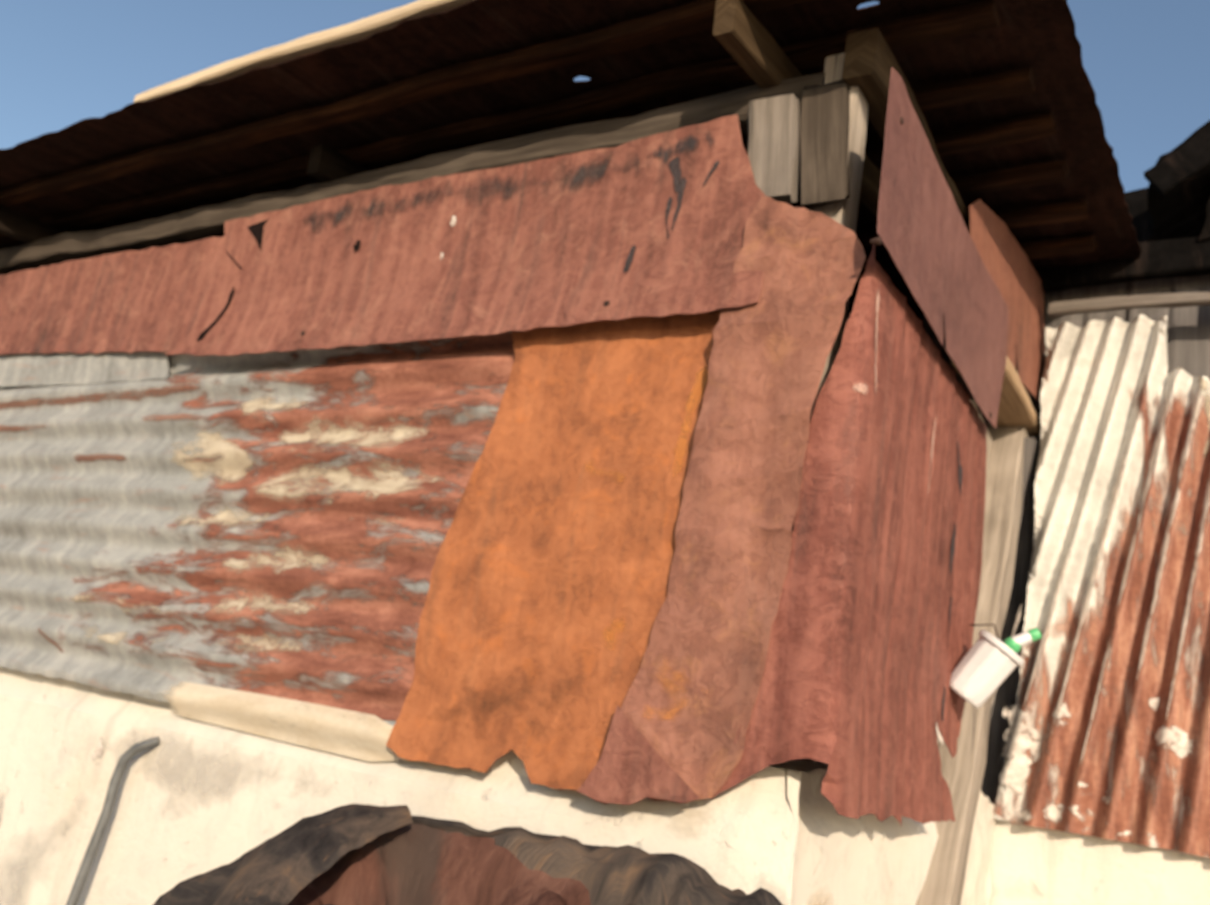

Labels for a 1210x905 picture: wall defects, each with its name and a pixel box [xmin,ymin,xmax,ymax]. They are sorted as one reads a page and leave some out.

rust [0,332,515,762]
rust [676,368,708,469]
rust [993,376,1210,858]